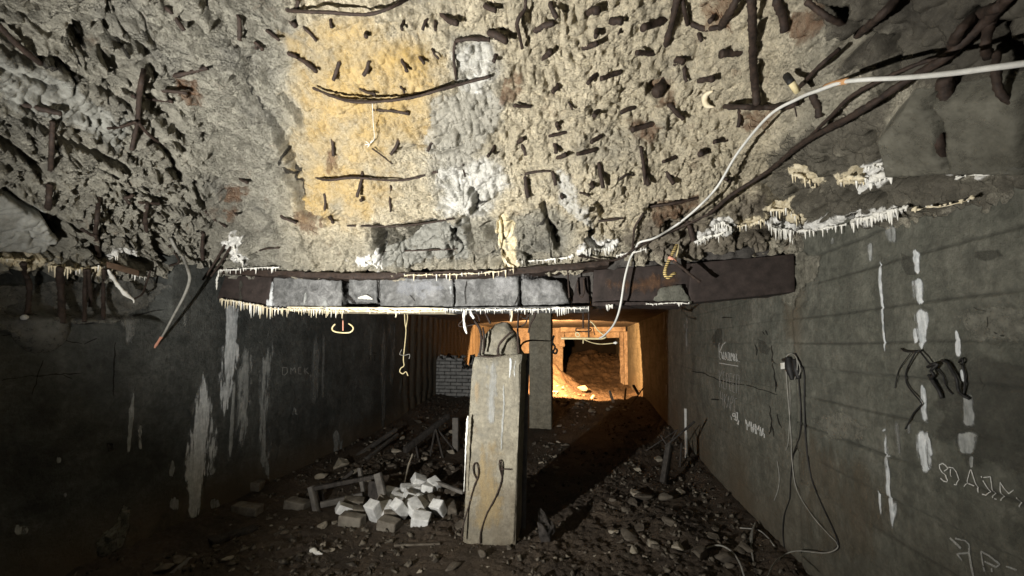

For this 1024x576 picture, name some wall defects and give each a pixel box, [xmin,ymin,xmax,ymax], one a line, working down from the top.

spalling [285,0,409,17]
spalling [515,0,527,50]
peeling [0,57,174,220]
spalling [312,36,505,182]
spalling [578,0,1014,262]
efflorescence [0,248,147,281]
spalling [0,197,171,336]
spalling [201,244,231,281]
spalling [347,215,470,268]
water stain [185,0,1024,525]
spalling [783,251,821,308]